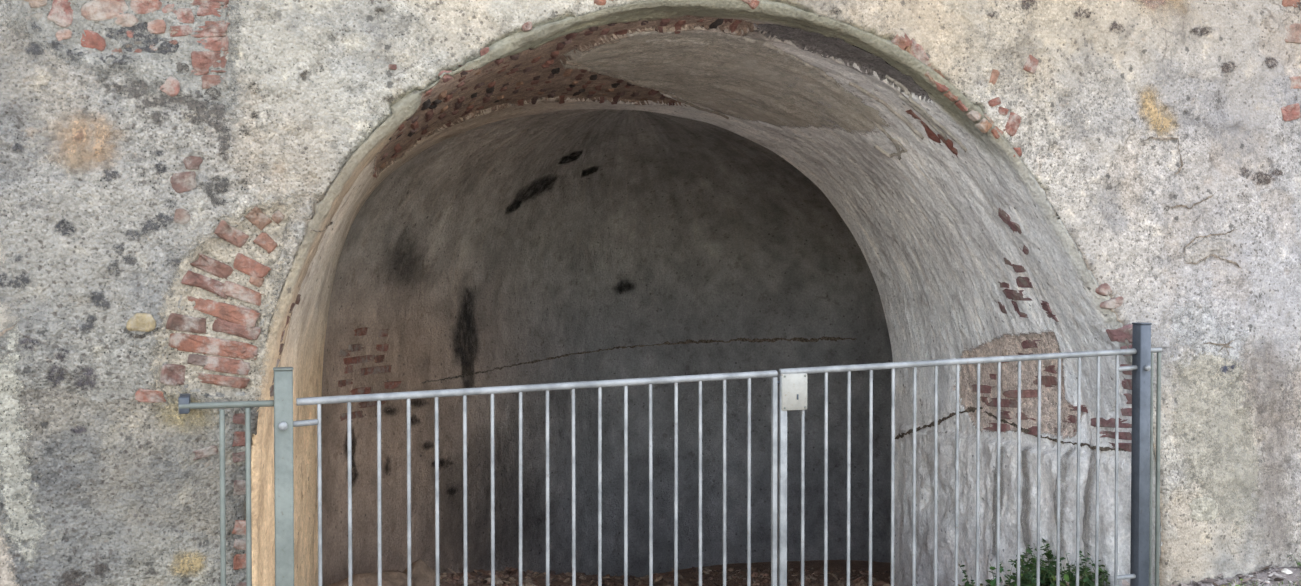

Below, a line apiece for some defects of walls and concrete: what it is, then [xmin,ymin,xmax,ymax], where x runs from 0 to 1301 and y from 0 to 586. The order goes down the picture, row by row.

spalling [1282,0,1301,43]
spalling [3,0,243,114]
peeling [373,0,1022,178]
spalling [1280,76,1301,121]
spalling [170,156,203,224]
water stain [506,151,598,213]
spalling [135,195,301,463]
water stain [454,289,478,388]
spalling [952,208,1132,452]
crack [895,406,1126,452]
spalling [232,520,246,586]